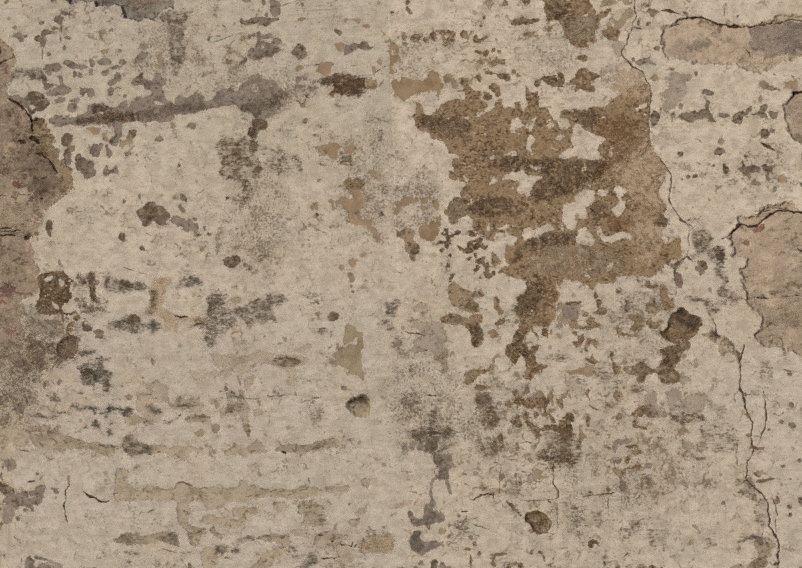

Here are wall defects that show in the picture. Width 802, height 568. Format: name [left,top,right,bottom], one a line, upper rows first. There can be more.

peeling [334,18,373,55]
crack [661,9,802,28]
crack [9,99,58,179]
crack [621,0,696,295]
crack [0,227,31,240]
spalling [0,0,333,414]
peeling [372,0,802,443]
crack [722,208,802,239]
peeling [335,324,364,381]
peeling [0,339,354,471]
flaking render [341,386,371,418]
crack [713,319,797,568]